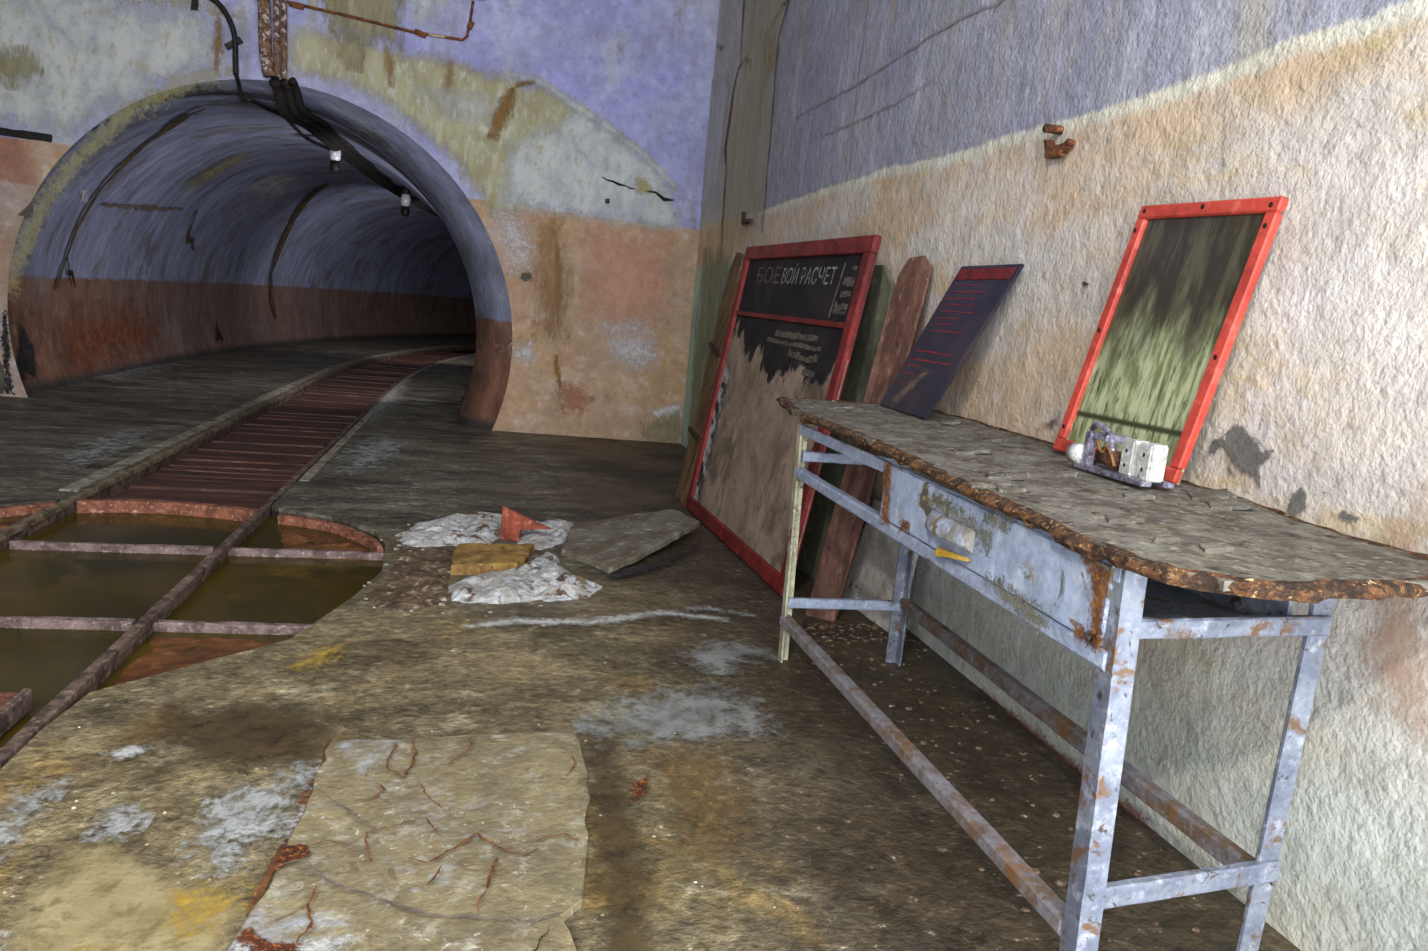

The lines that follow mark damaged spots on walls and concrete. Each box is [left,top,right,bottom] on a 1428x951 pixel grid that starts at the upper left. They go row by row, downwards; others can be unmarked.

crack [602,177,674,201]
crack [720,0,1002,260]
peeling [1186,423,1274,511]
crack [231,737,578,951]